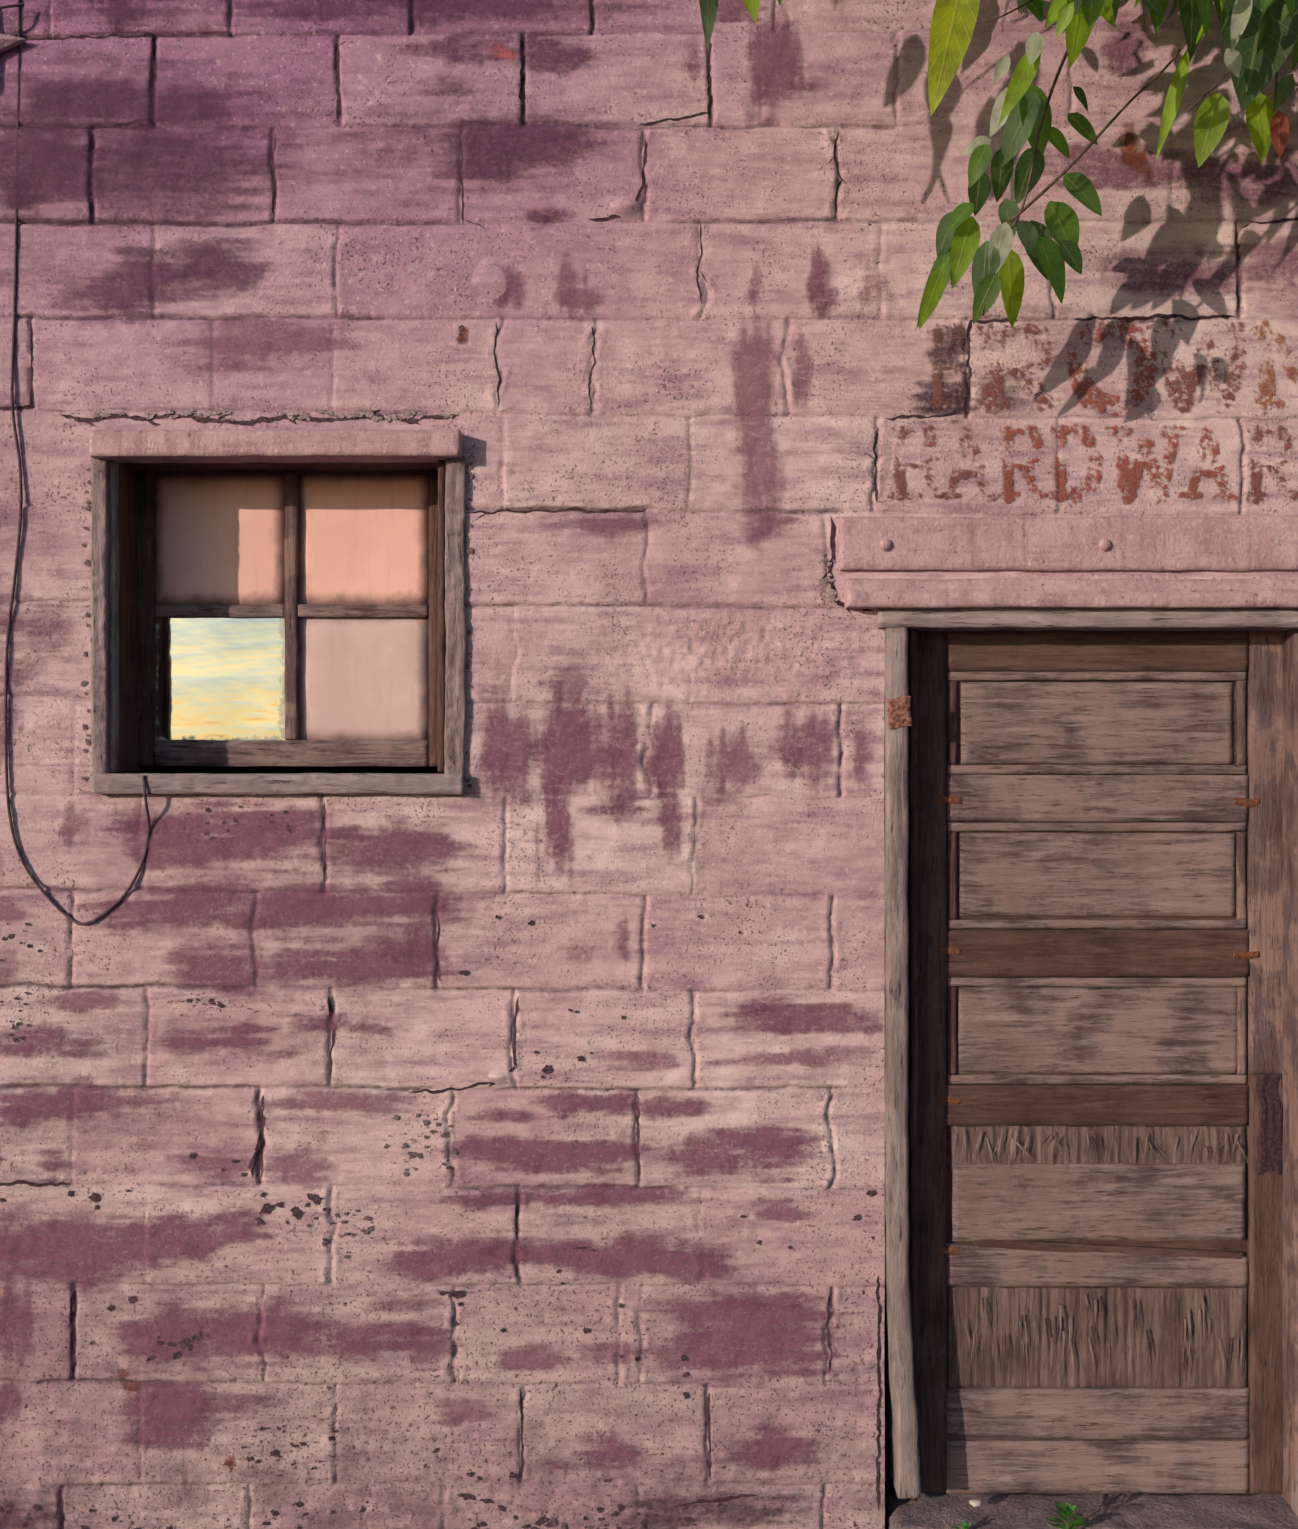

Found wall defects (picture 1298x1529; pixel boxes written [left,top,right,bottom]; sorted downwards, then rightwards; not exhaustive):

water stain [716,0,817,124]
water stain [70,238,268,319]
crack [0,325,458,427]
crack [493,325,501,407]
water stain [732,328,793,544]
crack [866,318,1017,502]
crack [823,517,873,613]
water stain [480,680,683,864]
water stain [454,1092,818,1221]
water stain [0,1210,270,1359]
water stain [118,1297,455,1364]
water stain [388,1230,832,1380]